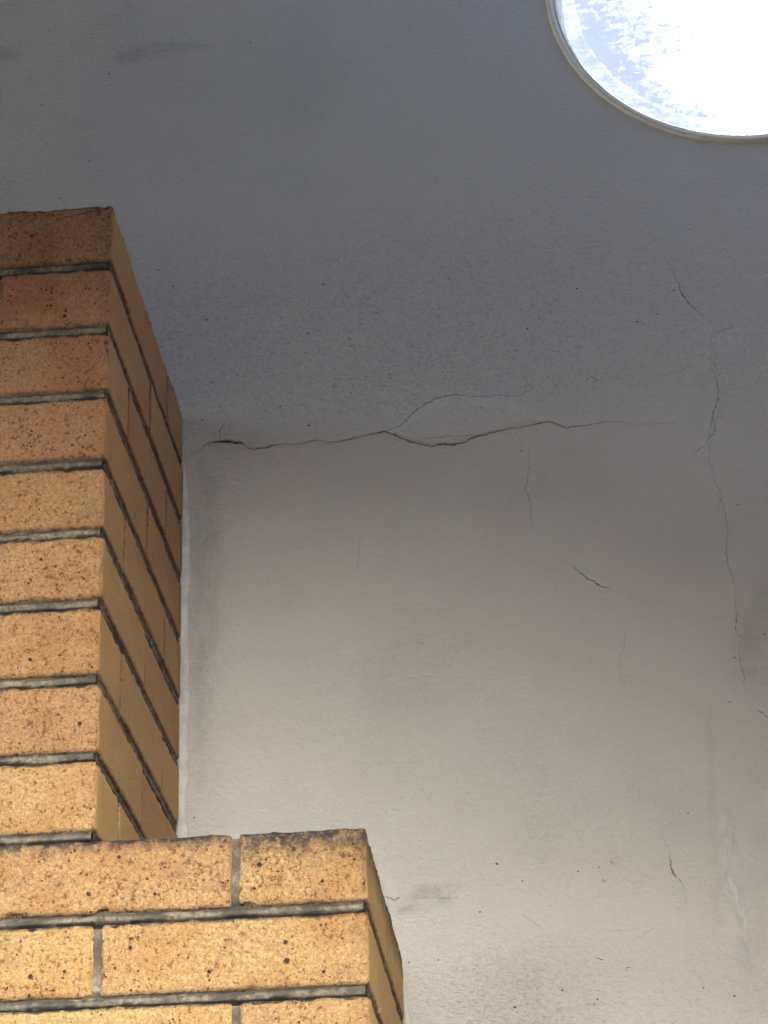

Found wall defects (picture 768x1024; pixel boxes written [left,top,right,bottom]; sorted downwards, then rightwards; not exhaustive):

crack [182,393,676,463]